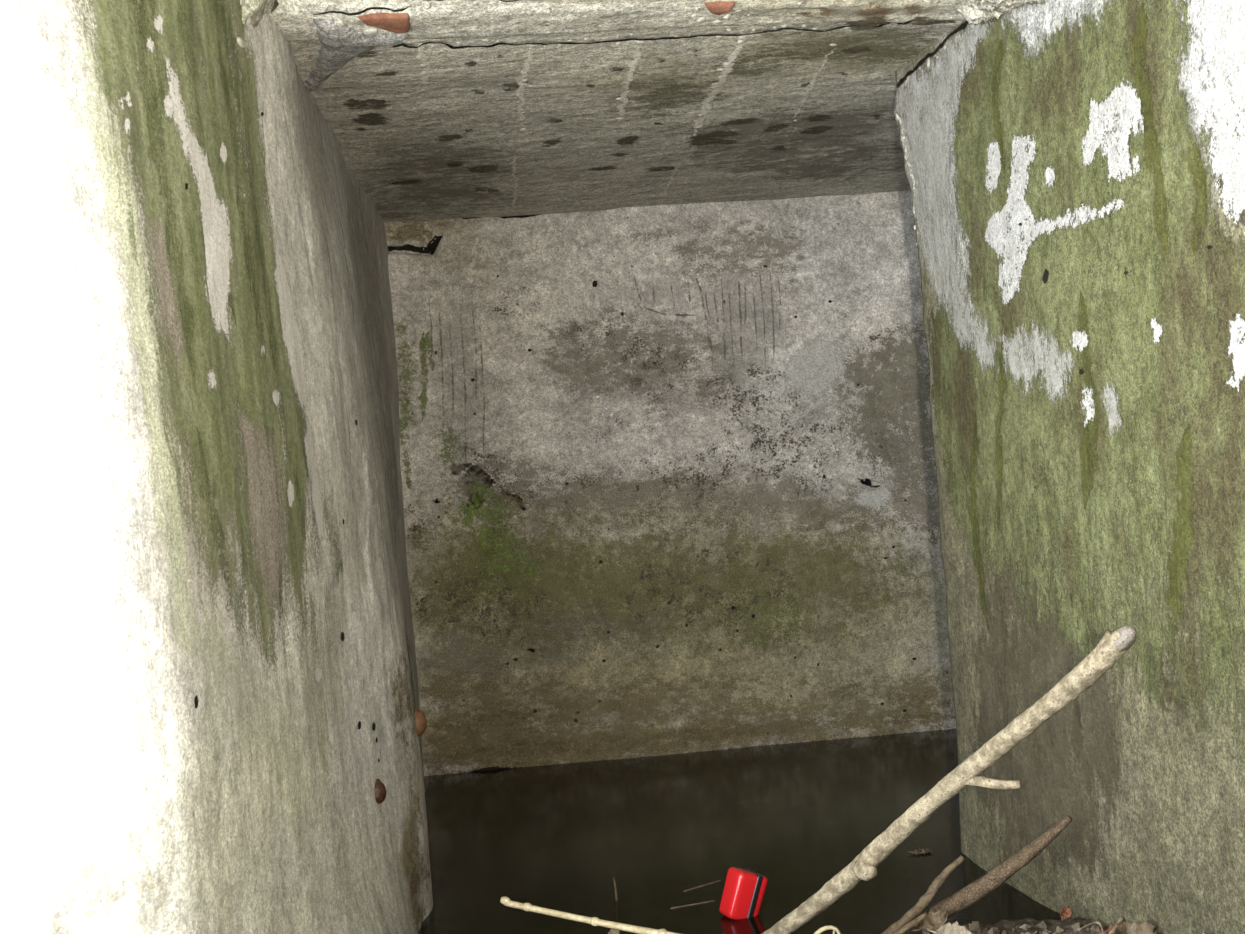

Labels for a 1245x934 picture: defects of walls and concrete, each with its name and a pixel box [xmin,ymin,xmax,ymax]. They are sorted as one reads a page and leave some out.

crack [308,0,969,220]
damp [611,23,936,184]
peeling [872,0,1089,401]
peeling [985,134,1124,304]
peeling [1082,81,1144,182]
peeling [1184,0,1245,234]
peeling [1082,384,1122,435]
peeling [1226,314,1245,392]
damp [236,410,288,612]
damp [371,432,955,780]
damp [972,559,1101,752]
damp [977,672,1127,878]